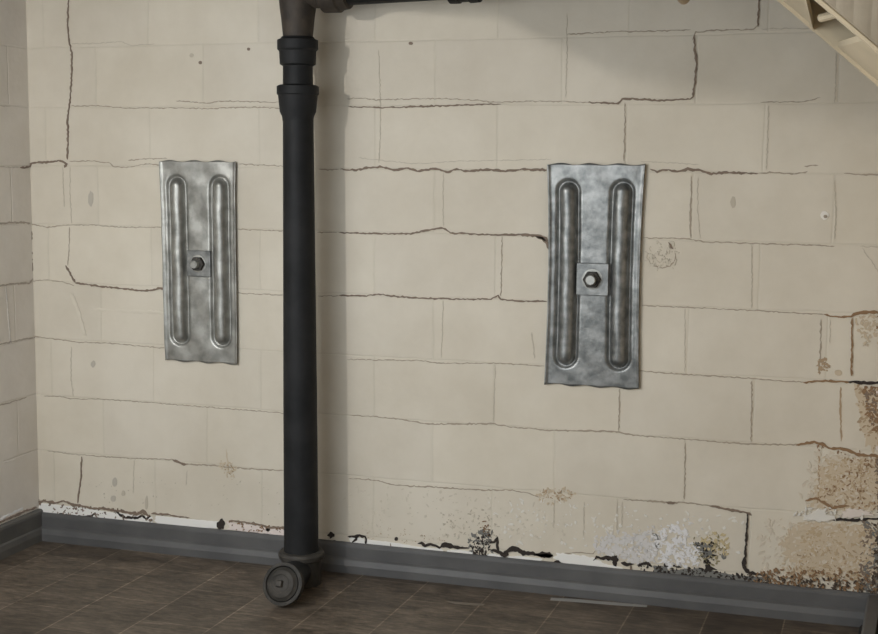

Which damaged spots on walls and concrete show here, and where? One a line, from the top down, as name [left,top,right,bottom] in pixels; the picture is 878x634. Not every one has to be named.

crack [0,0,283,414]
crack [317,0,878,575]
damp [342,383,878,594]
damp [816,357,830,374]